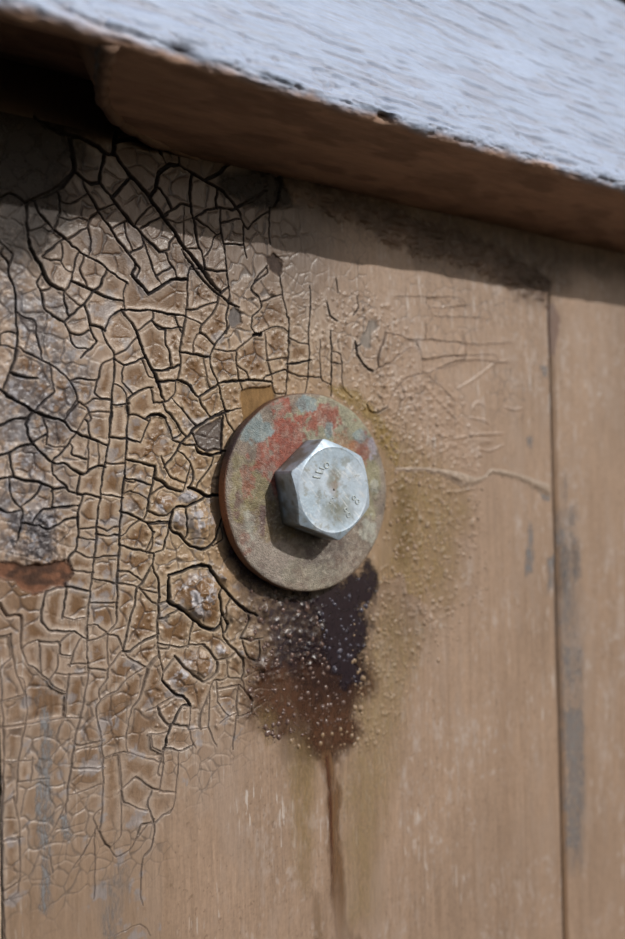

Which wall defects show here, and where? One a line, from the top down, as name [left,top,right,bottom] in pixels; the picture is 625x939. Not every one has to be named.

crack [0,134,512,939]
corrosion [224,528,378,900]
corrosion [330,386,398,466]